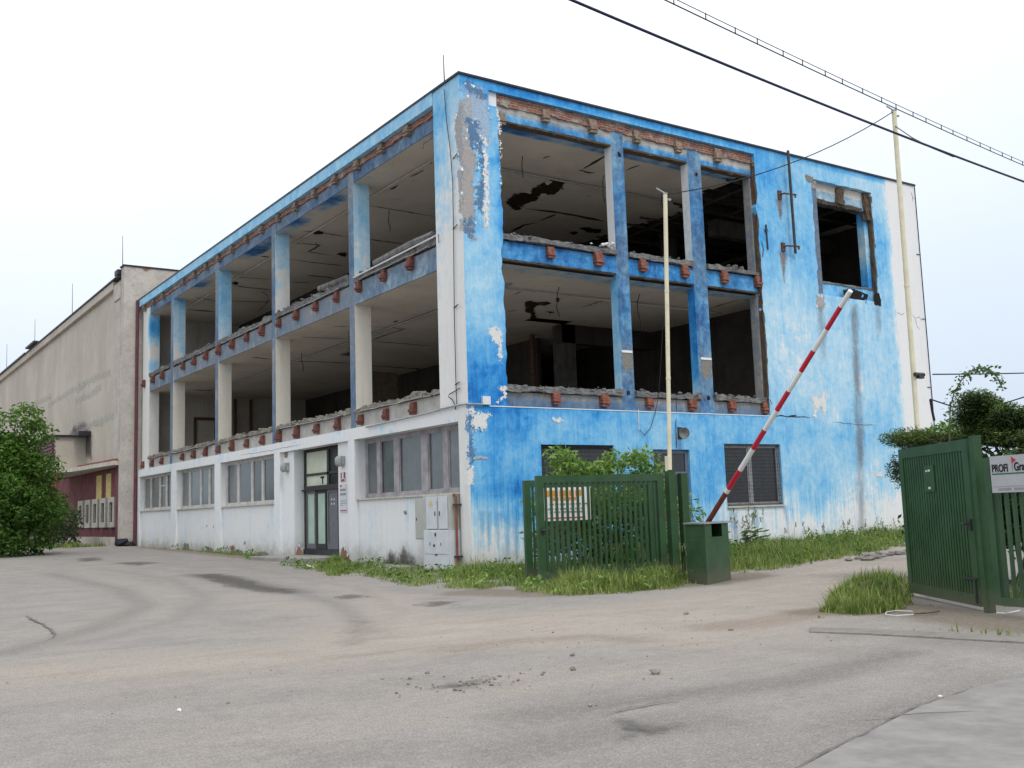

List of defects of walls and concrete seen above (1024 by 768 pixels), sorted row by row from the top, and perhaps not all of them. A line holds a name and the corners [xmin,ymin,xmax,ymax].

peeling [455,80,687,241]
spalling [524,298,560,319]
peeling [487,326,503,361]
spalling [465,357,772,486]
peeling [811,389,827,419]